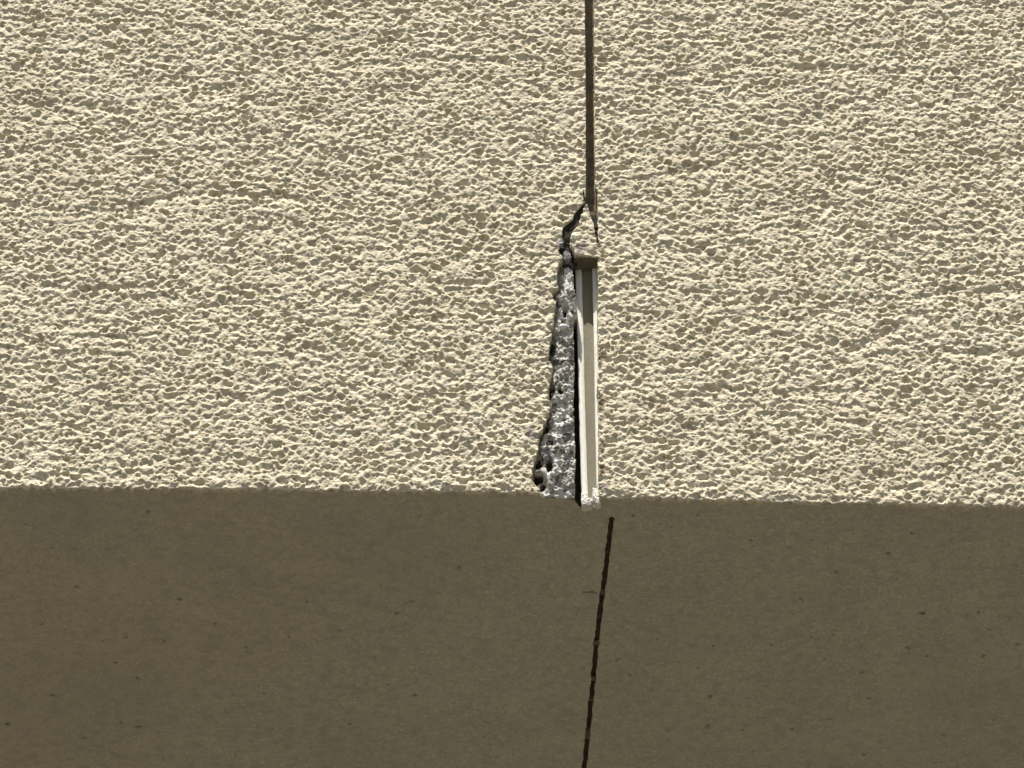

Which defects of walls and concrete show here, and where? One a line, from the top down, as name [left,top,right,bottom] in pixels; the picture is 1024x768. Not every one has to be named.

crack [559,189,599,294]
spalling [533,248,577,501]
crack [573,327,581,507]